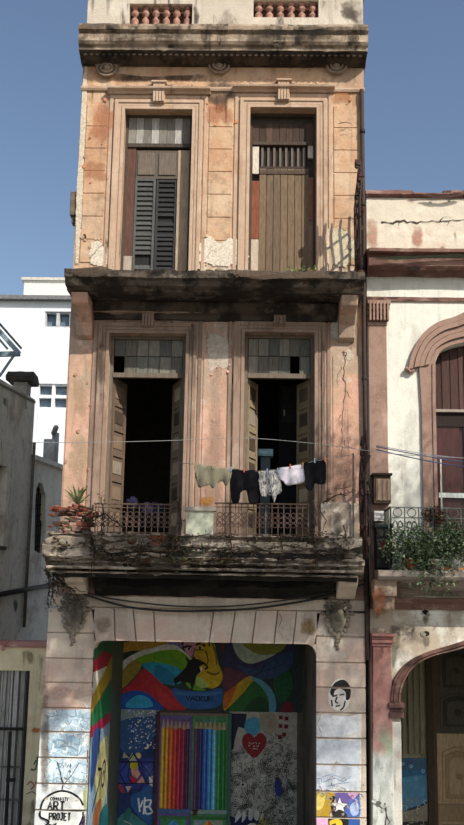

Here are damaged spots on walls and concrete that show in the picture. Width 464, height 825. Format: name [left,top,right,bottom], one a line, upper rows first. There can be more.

peeling [73,66,120,277]
crack [381,217,464,225]
peeling [199,234,332,280]
peeling [320,226,354,267]
peeling [207,333,231,375]
crack [337,352,349,453]
spalling [45,535,89,548]
spalling [104,542,166,558]
spalling [203,542,229,551]